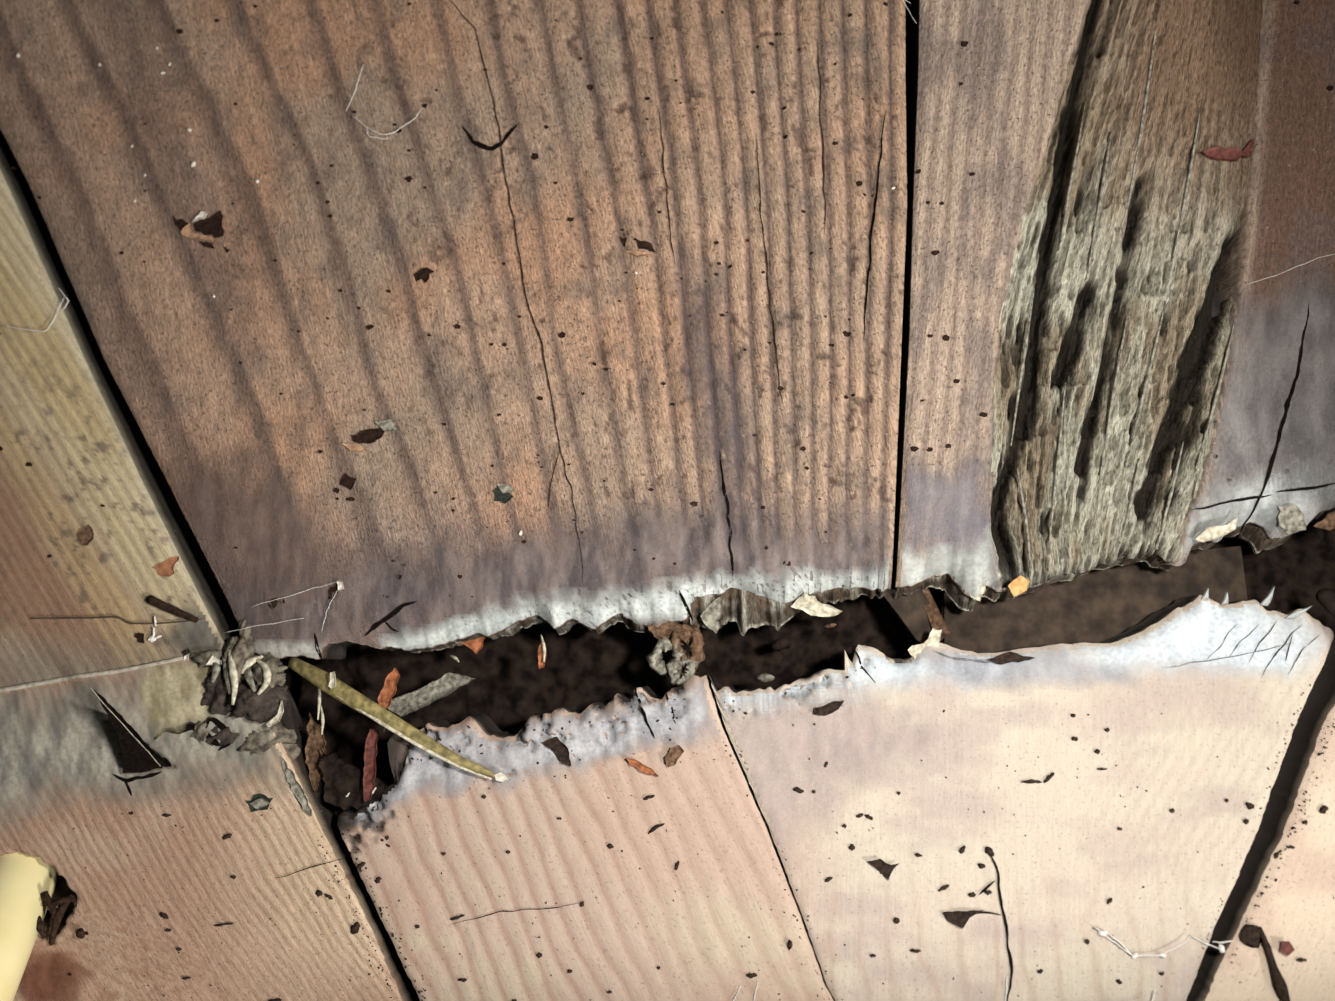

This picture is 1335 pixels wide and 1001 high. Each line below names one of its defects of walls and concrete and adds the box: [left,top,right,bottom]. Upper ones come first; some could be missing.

peeling [1202,138,1255,162]
crack [451,0,583,580]
peeling [1194,514,1239,542]
peeling [1277,503,1335,535]
peeling [328,582,344,600]
peeling [701,595,723,634]
peeling [791,592,842,617]
peeling [908,628,944,660]
damp [0,683,275,809]
peeling [281,712,394,816]
damp [246,793,273,812]